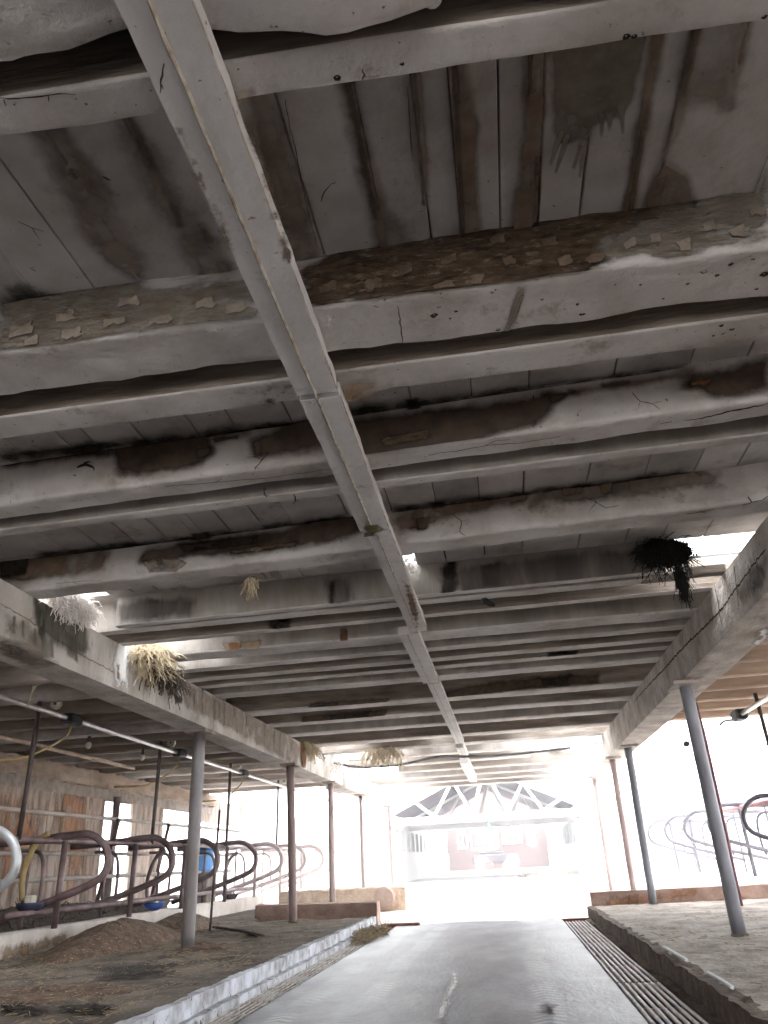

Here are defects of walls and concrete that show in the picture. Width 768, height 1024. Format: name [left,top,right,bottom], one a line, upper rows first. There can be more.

water stain [512,34,694,229]
water stain [33,129,143,279]
water stain [123,117,231,275]
peeling [300,191,768,306]
peeling [0,281,258,350]
crack [632,392,768,424]
spalling [144,558,186,572]